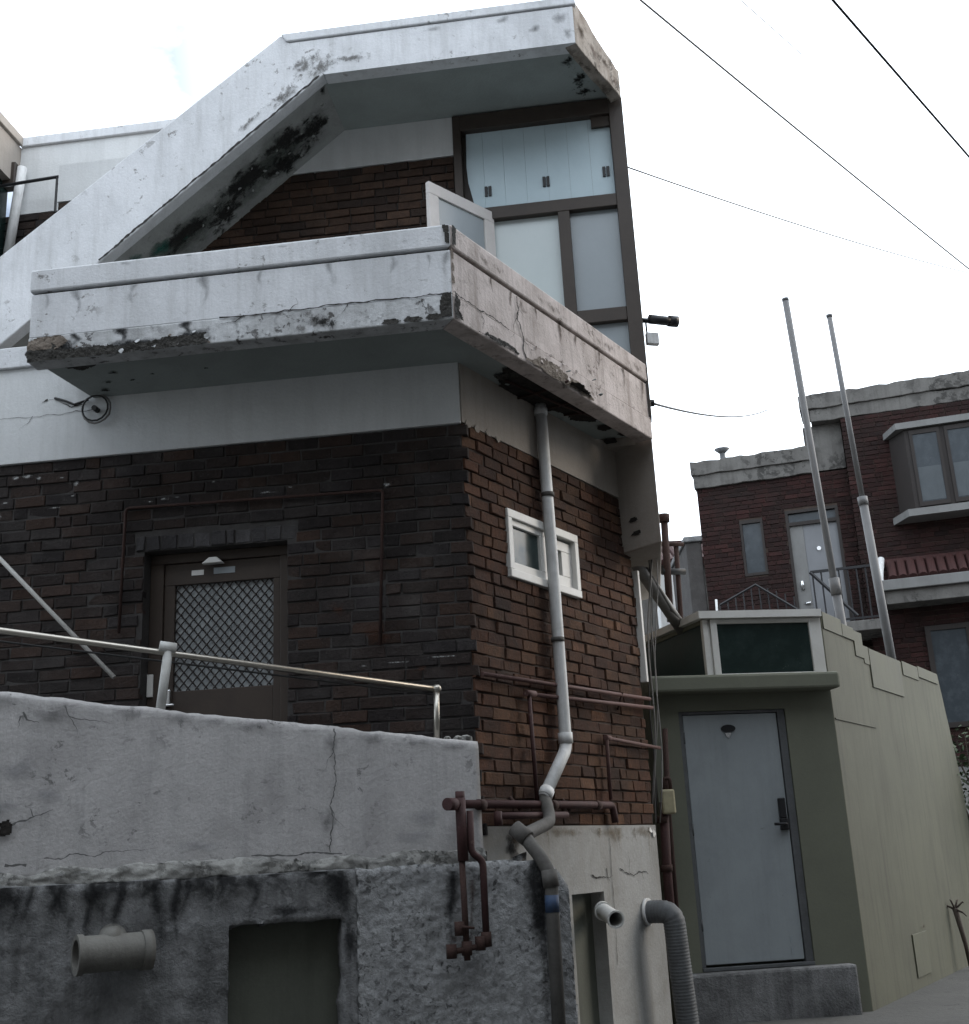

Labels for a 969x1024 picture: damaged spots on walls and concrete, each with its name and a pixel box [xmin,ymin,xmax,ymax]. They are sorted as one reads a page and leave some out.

peeling [297,311,334,330]
spalling [25,330,210,370]